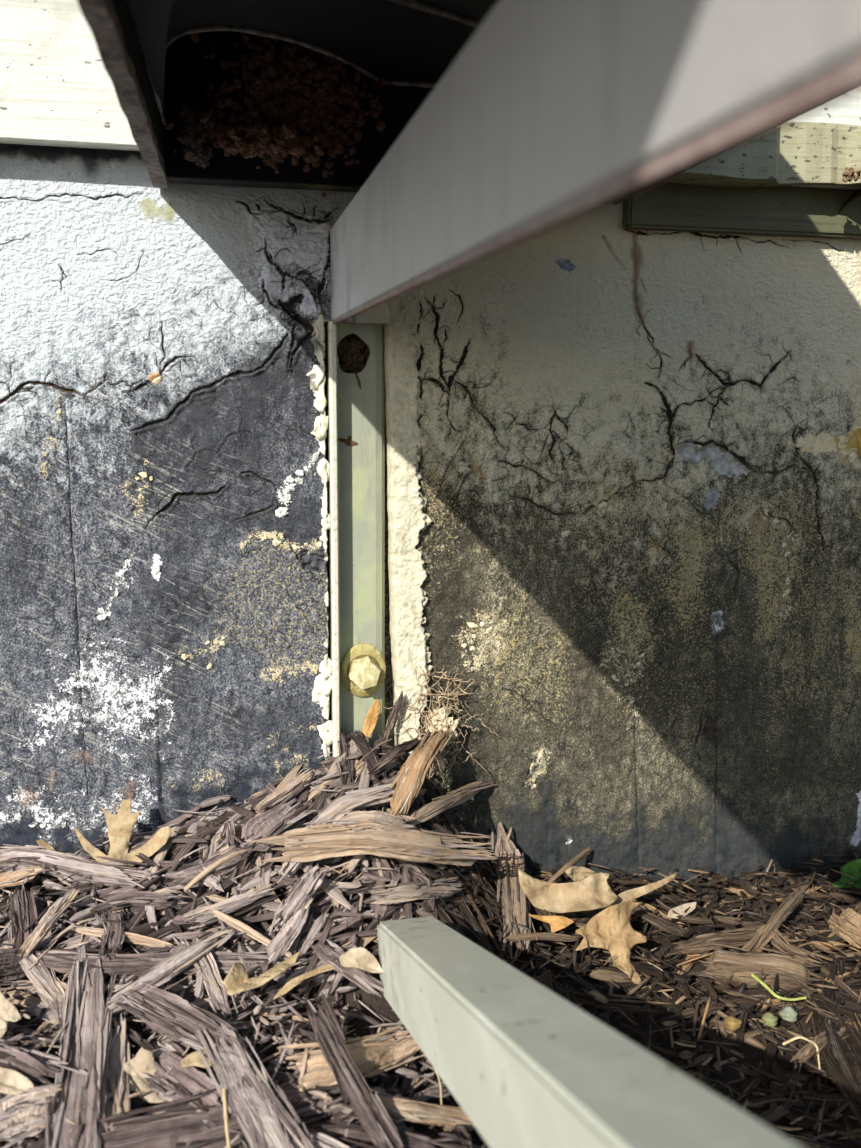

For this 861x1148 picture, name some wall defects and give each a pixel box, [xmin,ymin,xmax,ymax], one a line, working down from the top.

crack [0,193,141,201]
crack [0,198,338,795]
leakage [135,341,317,465]
crack [416,289,861,571]
spalling [677,440,751,510]
rust [835,429,861,464]
leakage [0,811,41,849]
leakage [54,822,107,854]
leakage [130,758,274,840]
leakage [483,786,854,886]